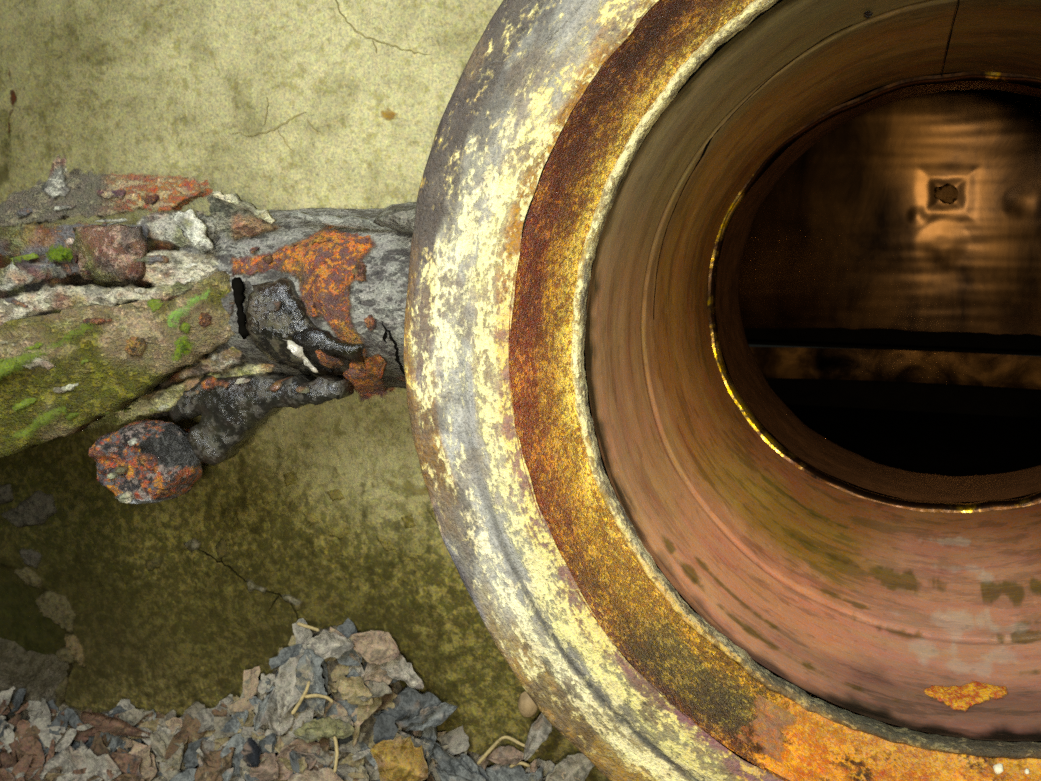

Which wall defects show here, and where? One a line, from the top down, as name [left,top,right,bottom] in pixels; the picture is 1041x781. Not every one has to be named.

crack [335,0,428,55]
rust [363,353,387,379]
crack [145,537,304,619]
rust [924,681,1007,711]
rust [735,694,1041,781]